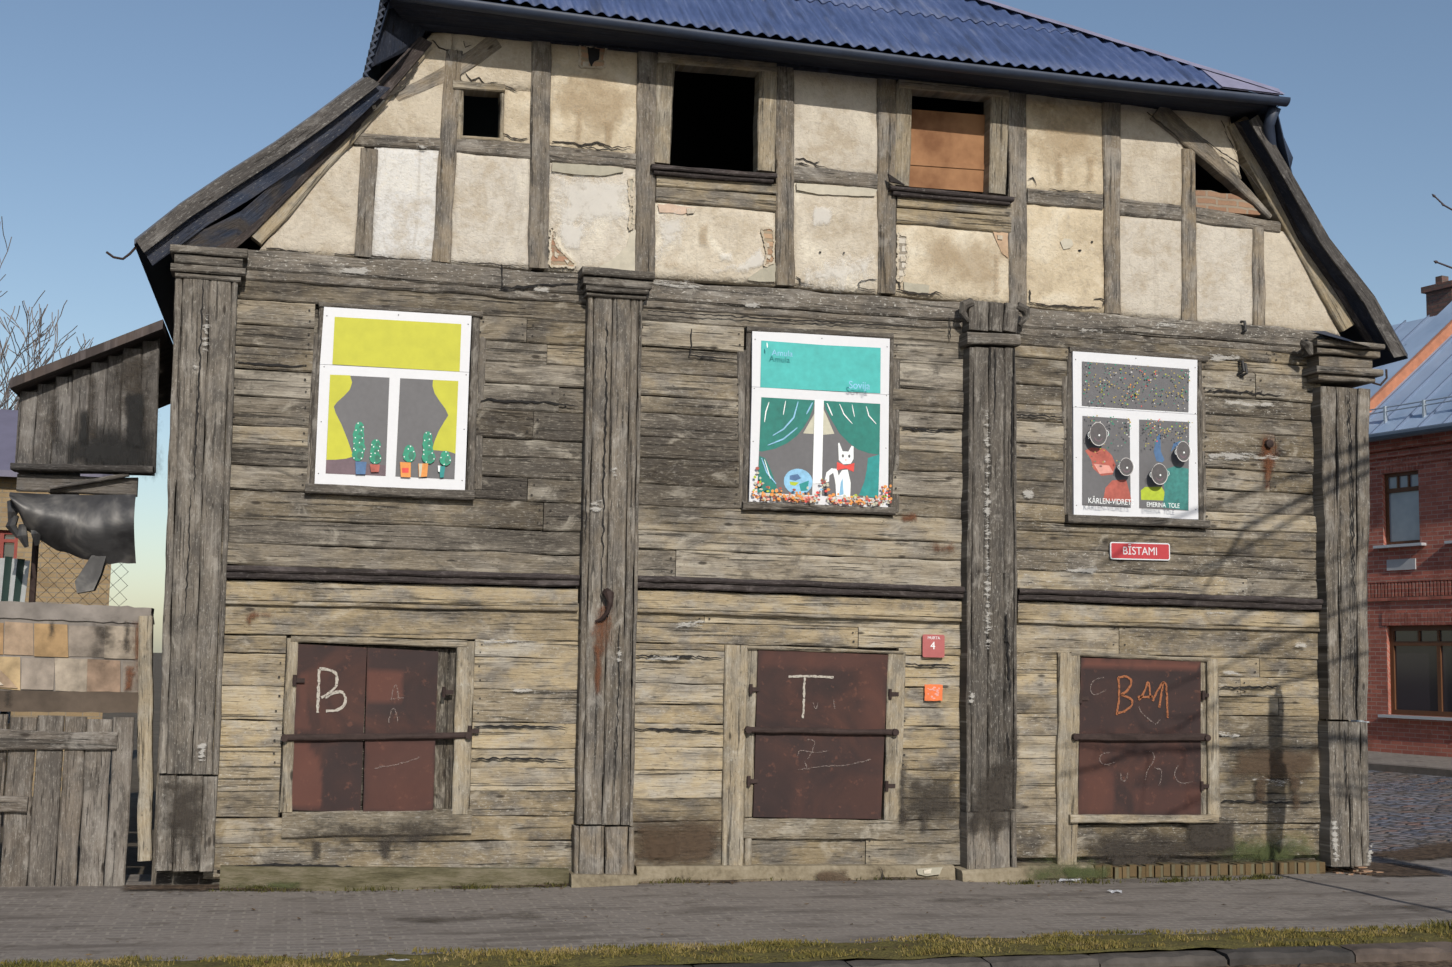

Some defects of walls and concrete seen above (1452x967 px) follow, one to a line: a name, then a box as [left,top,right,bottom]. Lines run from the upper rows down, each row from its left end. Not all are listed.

crack [503,133,633,151]
peeling [338,264,371,274]
spalling [548,228,577,269]
spalling [760,227,776,267]
spalling [895,232,909,283]
rust [592,607,611,692]